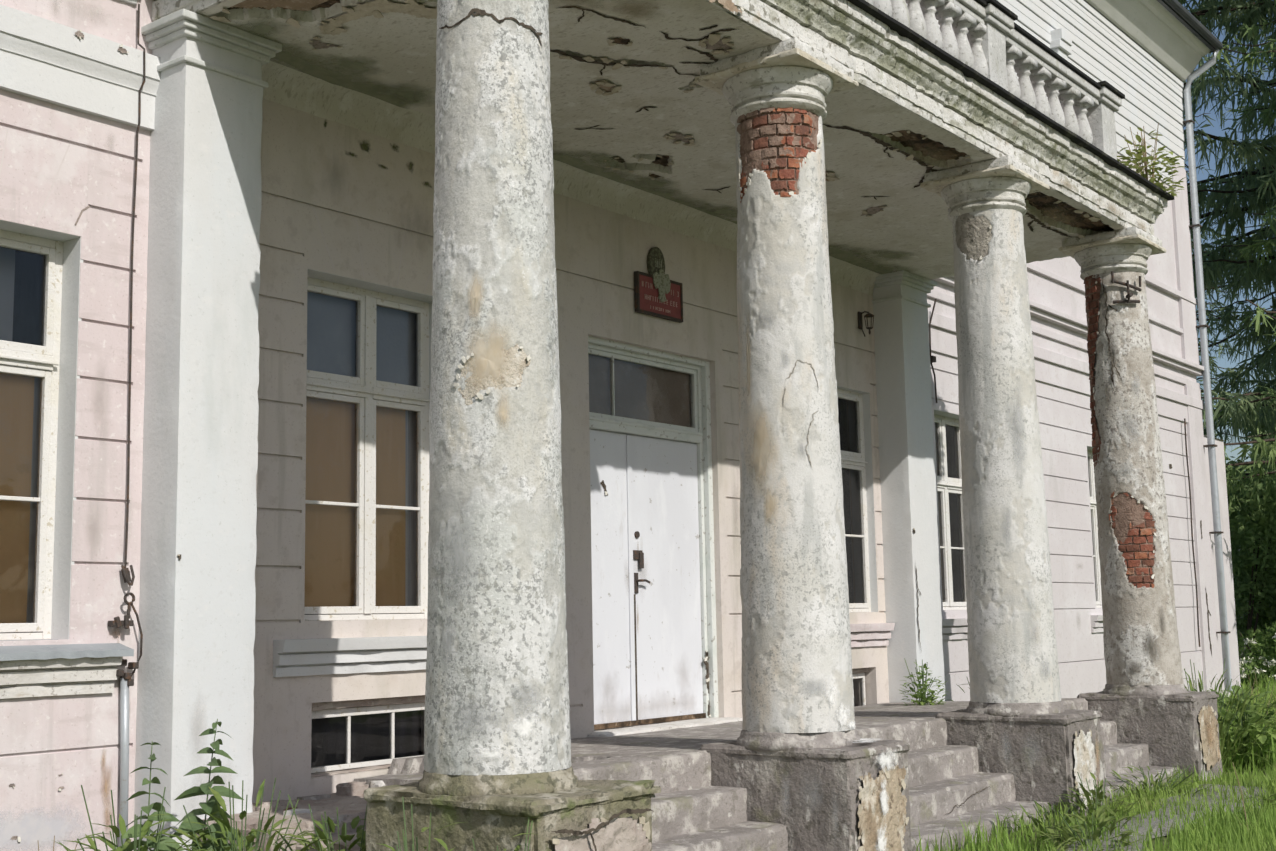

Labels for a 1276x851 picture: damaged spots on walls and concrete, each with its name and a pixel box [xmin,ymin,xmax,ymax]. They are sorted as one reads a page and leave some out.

peeling [280,0,437,50]
crack [439,6,739,76]
flaking render [737,107,822,203]
crack [823,124,937,200]
flaking render [1025,192,1114,238]
peeling [453,344,531,405]
flaking render [1084,275,1102,473]
crack [783,360,819,467]
flaking render [1108,492,1157,588]
peeling [1198,705,1221,770]
peeling [857,763,909,851]